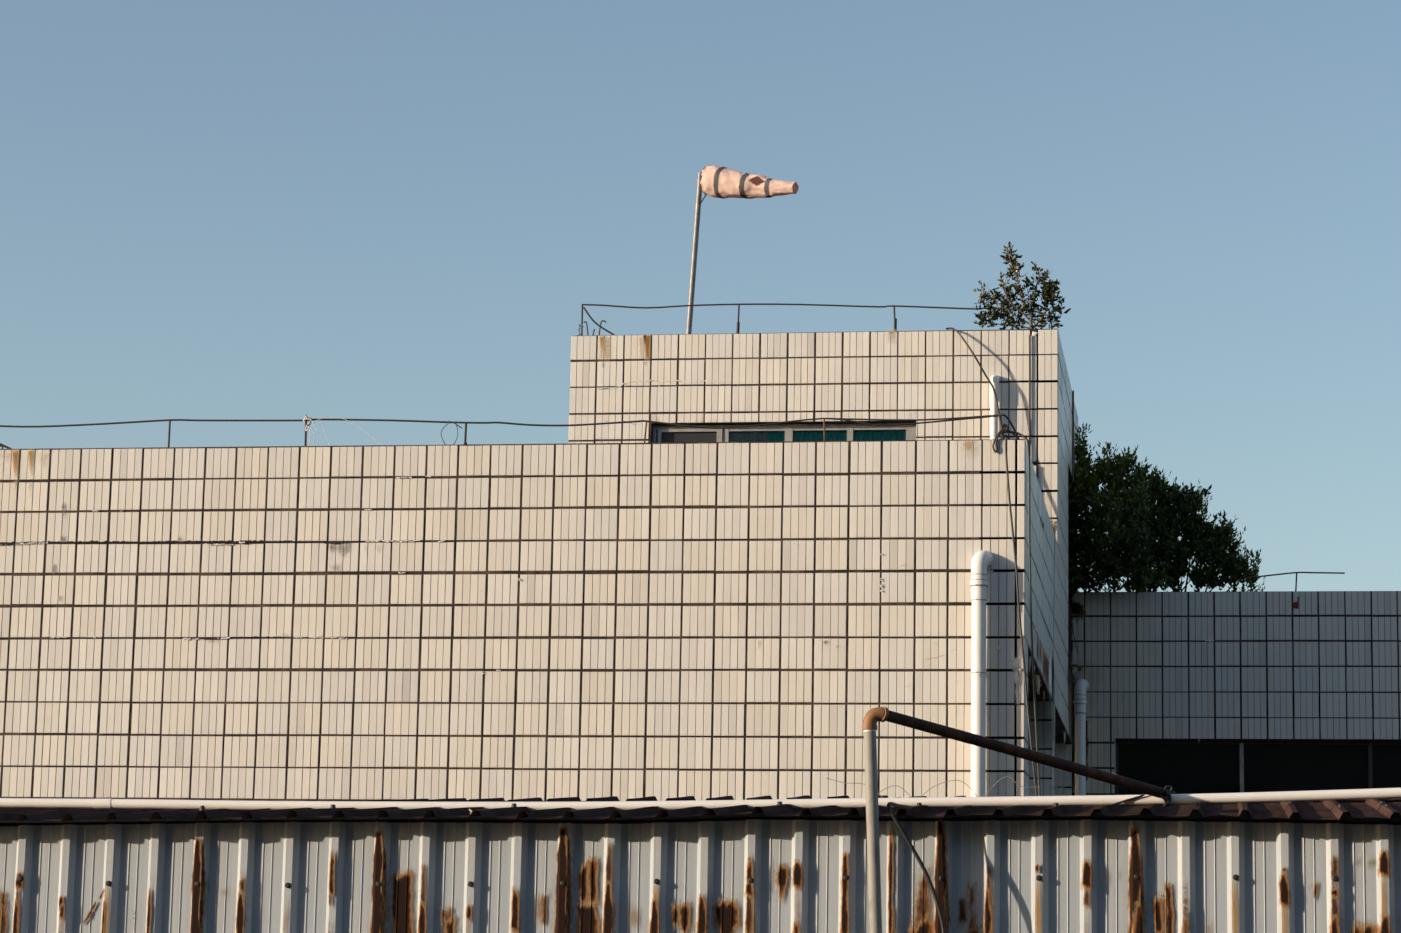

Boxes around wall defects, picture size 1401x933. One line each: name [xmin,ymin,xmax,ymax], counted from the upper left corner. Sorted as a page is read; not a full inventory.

corrosion [369,831,472,933]
corrosion [510,887,520,933]
corrosion [538,827,756,933]
corrosion [775,859,804,933]
corrosion [888,818,994,933]
corrosion [1127,828,1188,933]